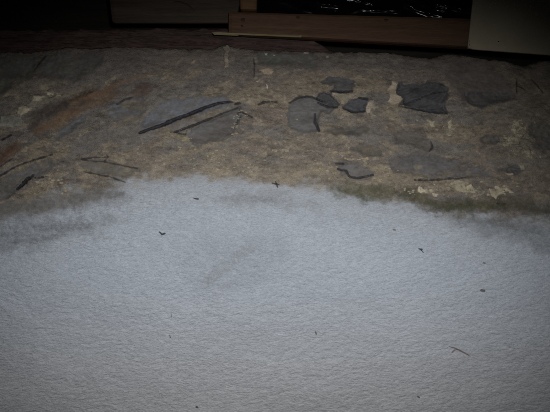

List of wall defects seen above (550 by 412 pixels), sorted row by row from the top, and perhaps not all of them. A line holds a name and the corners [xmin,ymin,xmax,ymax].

spalling [143,96,252,150]
spalling [287,77,368,132]
spalling [396,82,448,127]
spalling [314,160,399,182]
spalling [403,184,438,197]
spalling [445,165,525,200]